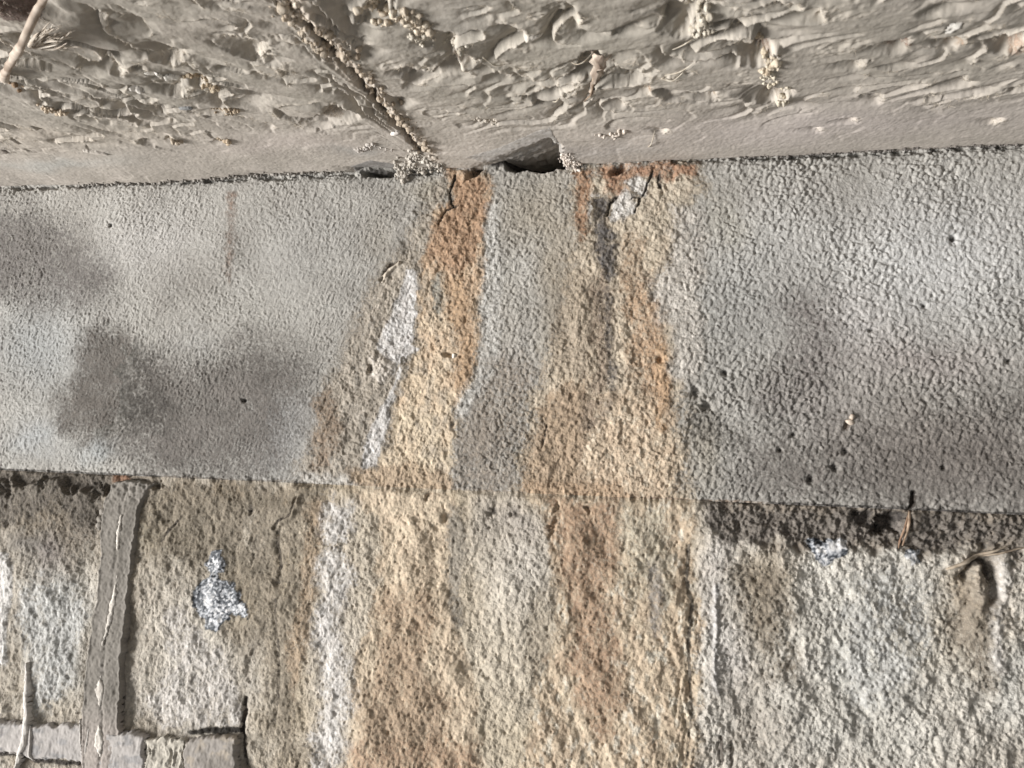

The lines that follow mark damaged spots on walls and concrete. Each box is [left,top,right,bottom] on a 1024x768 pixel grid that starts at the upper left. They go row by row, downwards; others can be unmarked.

crack [439,175,456,225]
corrosion [297,159,707,768]
corrosion [285,498,323,697]